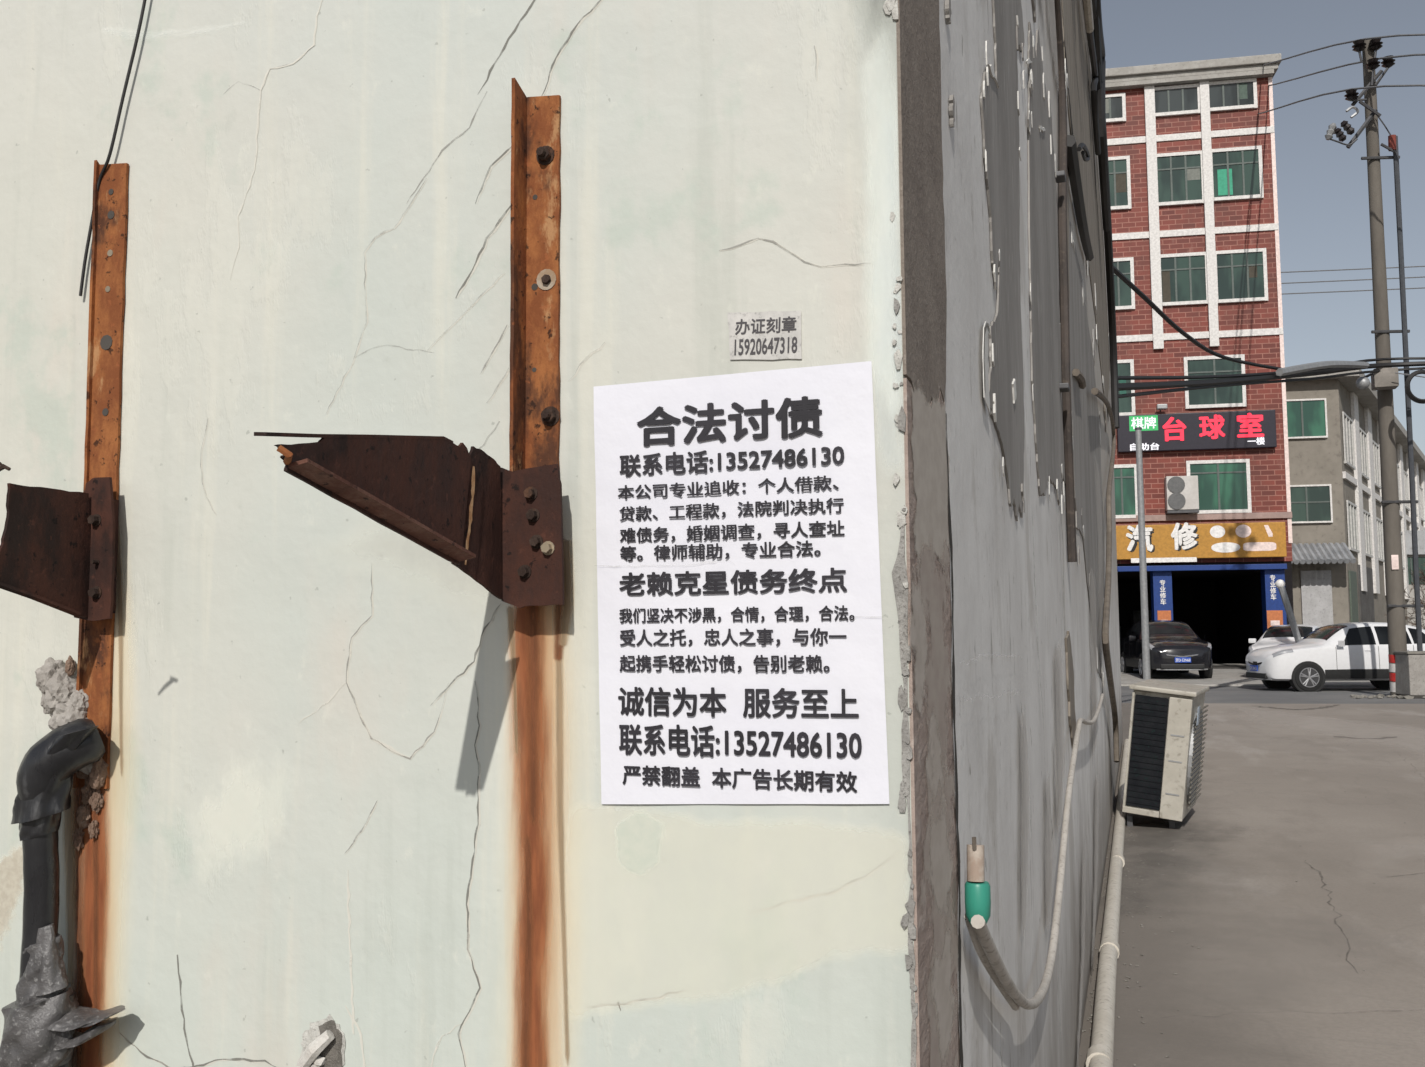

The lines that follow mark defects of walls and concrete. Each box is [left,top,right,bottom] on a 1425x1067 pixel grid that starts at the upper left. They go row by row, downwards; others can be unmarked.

crack [327,0,535,414]
crack [542,0,603,96]
crack [721,238,873,268]
peeling [883,0,960,1067]
peeling [980,0,1110,708]
corrosion [64,530,123,1067]
crack [114,955,276,1067]
spalling [297,1014,346,1067]
crack [299,569,502,1067]
corrosion [507,540,571,1067]